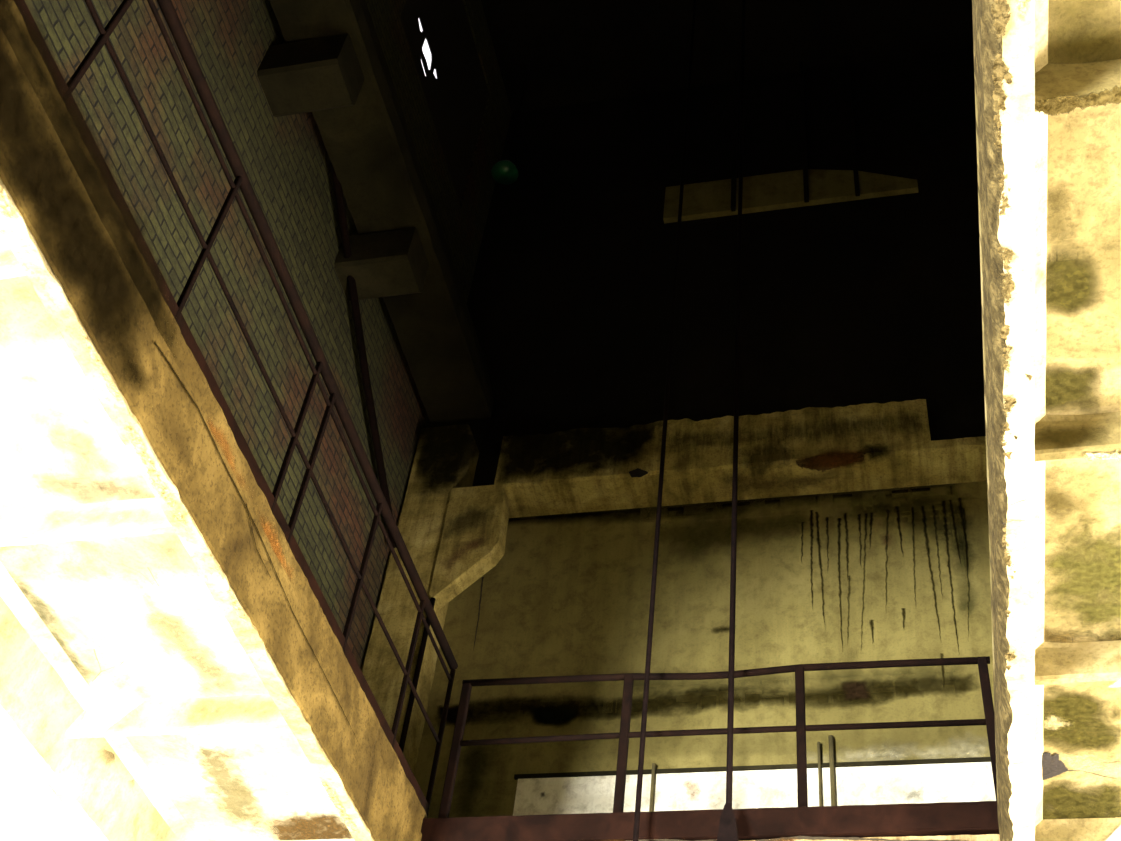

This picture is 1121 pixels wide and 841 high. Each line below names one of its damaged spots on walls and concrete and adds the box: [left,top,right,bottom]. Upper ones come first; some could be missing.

spalling [991,0,1030,152]
spalling [1035,85,1121,116]
spalling [997,173,1011,216]
leakage [1046,251,1097,313]
spalling [996,247,1018,459]
leakage [1045,369,1098,409]
leakage [508,417,971,652]
leakage [1045,492,1071,513]
leakage [1044,526,1121,643]
leakage [438,653,973,726]
leakage [1043,689,1120,753]
leakage [201,749,257,819]